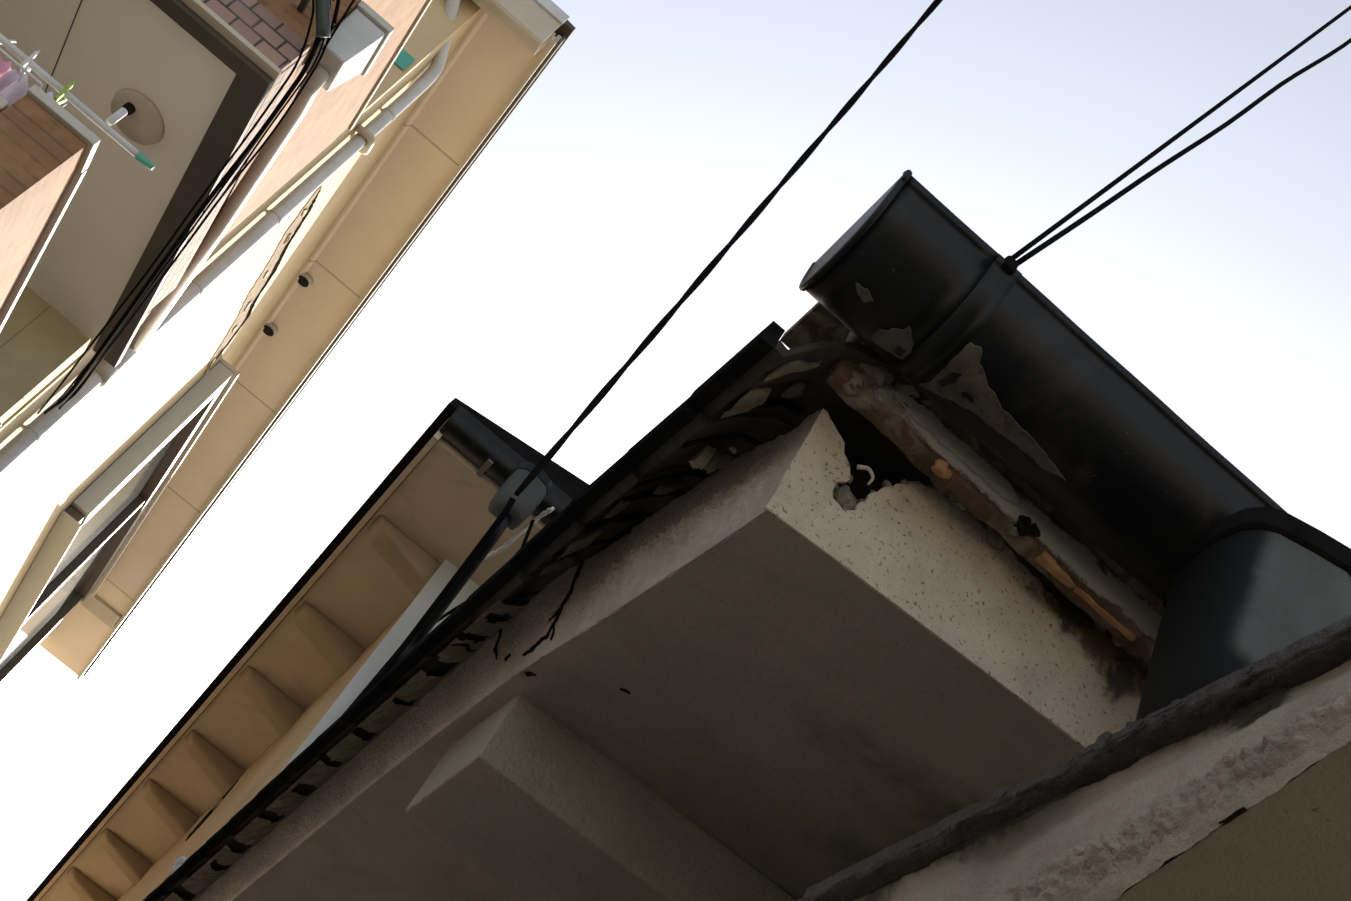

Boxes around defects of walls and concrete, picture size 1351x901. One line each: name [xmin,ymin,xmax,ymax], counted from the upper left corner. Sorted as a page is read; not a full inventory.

peeling [842,326,1066,481]
spalling [833,462,910,510]
crack [450,559,585,661]